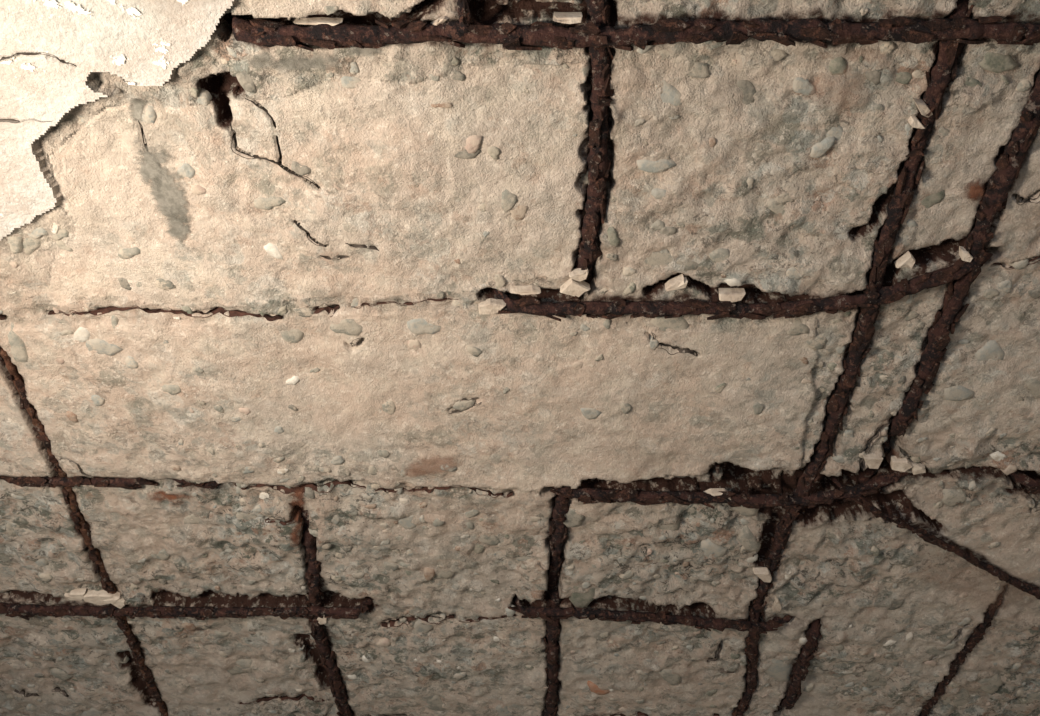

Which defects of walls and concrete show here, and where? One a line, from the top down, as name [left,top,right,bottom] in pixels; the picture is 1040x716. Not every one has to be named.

crack [0,52,77,67]
peeling [152,41,172,70]
spalling [225,0,1040,456]
spalling [0,347,158,490]
spalling [508,127,1040,716]
spalling [62,486,117,594]
rust [153,491,189,500]
spalling [173,479,222,489]
rust [290,487,304,546]
spalling [295,505,321,609]
spalling [0,597,373,716]